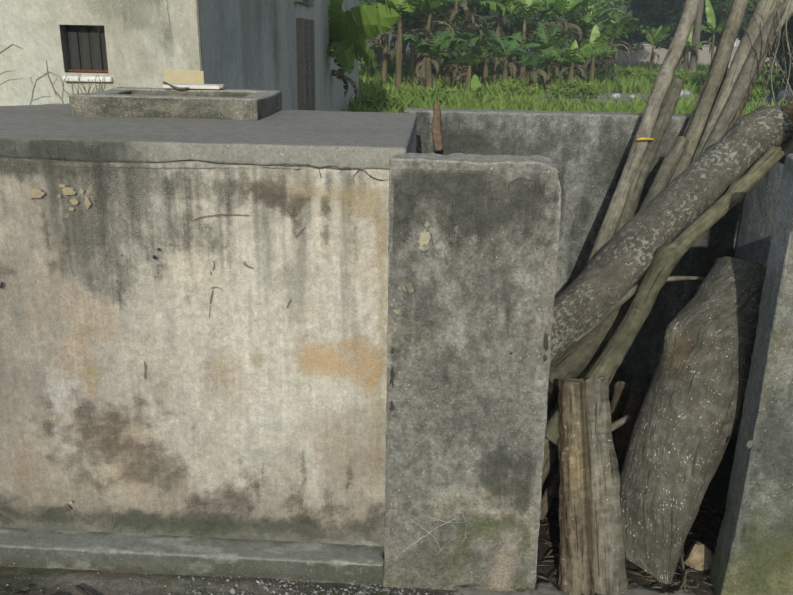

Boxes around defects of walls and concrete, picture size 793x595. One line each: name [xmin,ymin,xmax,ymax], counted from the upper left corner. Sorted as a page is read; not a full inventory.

peeling [57,184,91,211]
leakage [213,173,310,238]
crack [264,164,437,208]
spalling [418,221,433,253]
leakage [42,399,186,497]
leakage [0,458,384,545]